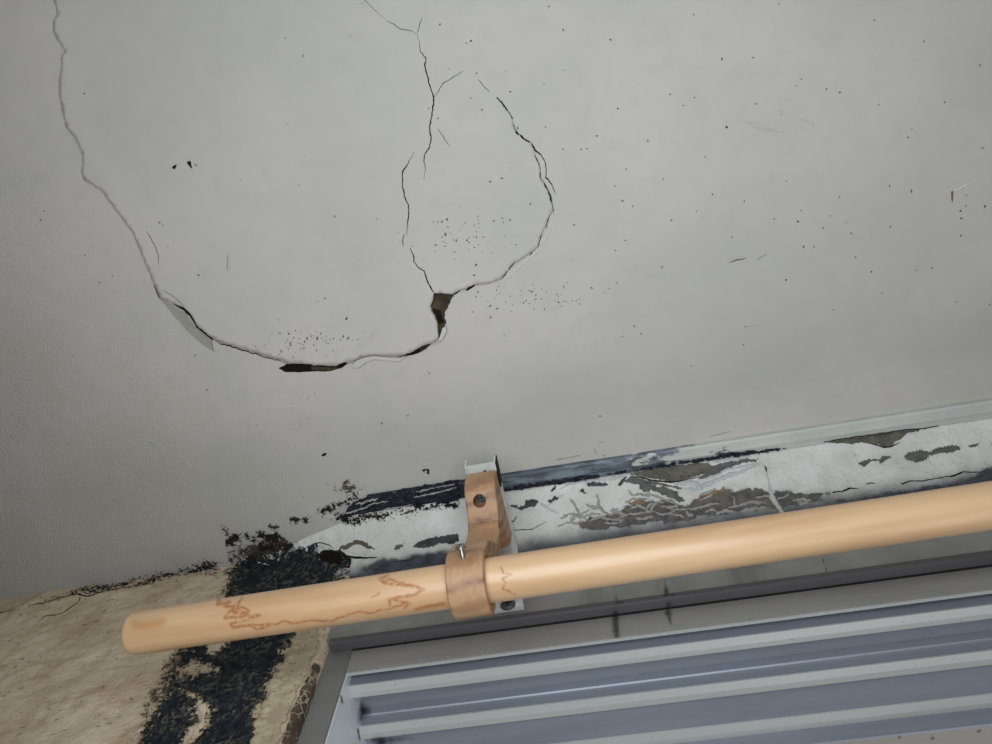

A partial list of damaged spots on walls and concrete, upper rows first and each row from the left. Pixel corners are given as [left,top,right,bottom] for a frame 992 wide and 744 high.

crack [364,0,555,292]
crack [154,286,288,365]
spalling [825,425,939,467]
peeling [904,443,979,463]
spalling [510,456,761,531]
leakage [31,515,377,622]
peeling [363,533,459,573]
leakage [131,632,296,744]